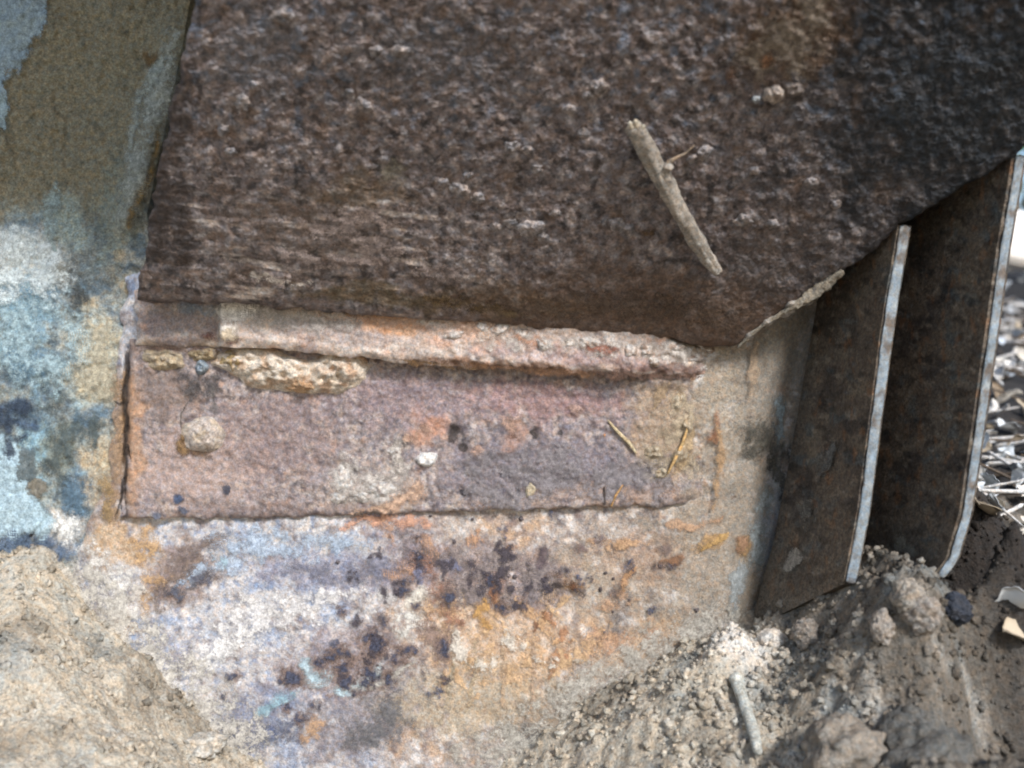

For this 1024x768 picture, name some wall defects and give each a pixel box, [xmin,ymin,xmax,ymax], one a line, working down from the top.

crack [114,347,131,518]
leakage [450,628,559,674]
rust [339,411,754,724]